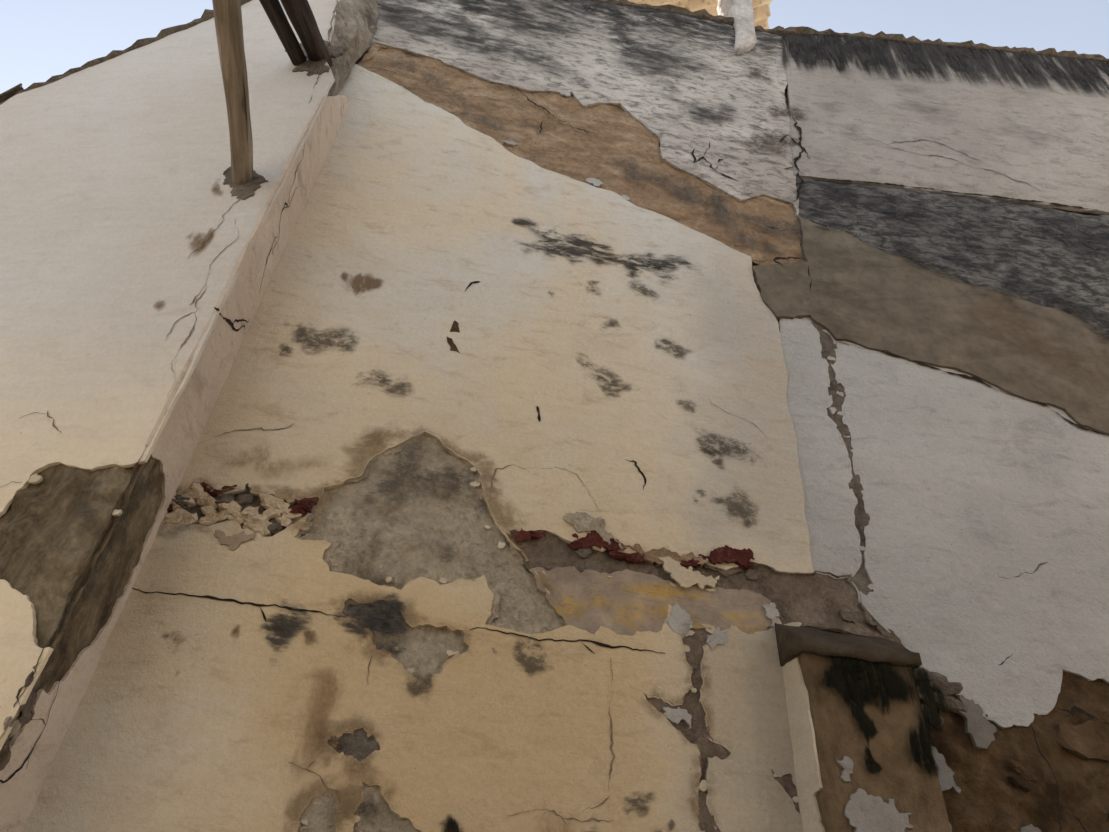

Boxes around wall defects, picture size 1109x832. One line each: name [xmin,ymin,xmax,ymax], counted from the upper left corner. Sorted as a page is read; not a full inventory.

crack [165,198,250,413]
crack [259,130,308,293]
spalling [357,44,804,266]
damp [513,219,690,296]
damp [744,127,792,153]
damp [744,29,1109,95]
crack [132,588,349,622]
spalling [0,430,903,832]
spalling [914,667,1109,832]